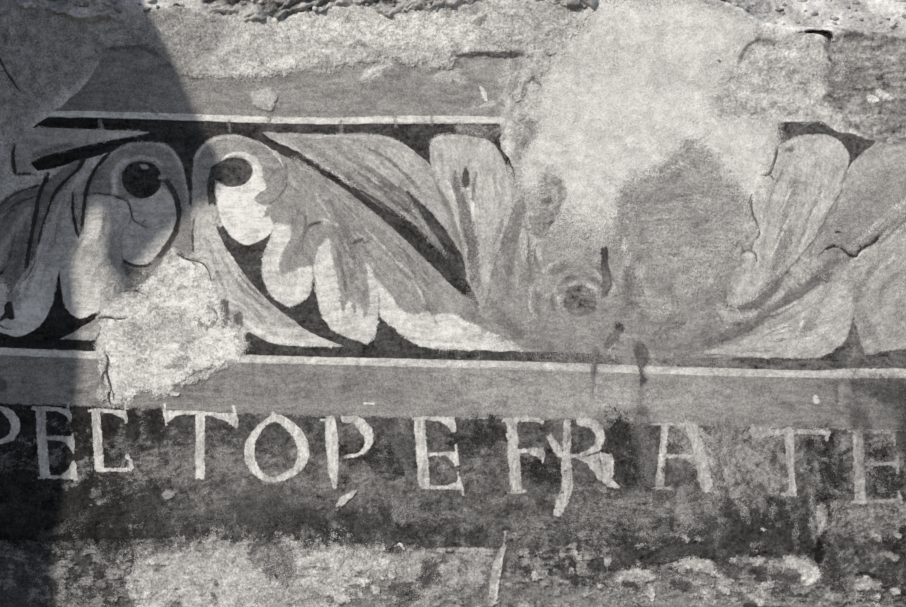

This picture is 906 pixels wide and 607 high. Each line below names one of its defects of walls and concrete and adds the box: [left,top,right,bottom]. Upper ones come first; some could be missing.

crack [101,355,115,404]
spalling [93,226,250,410]
leakage [588,135,779,551]
flaking render [0,512,906,607]